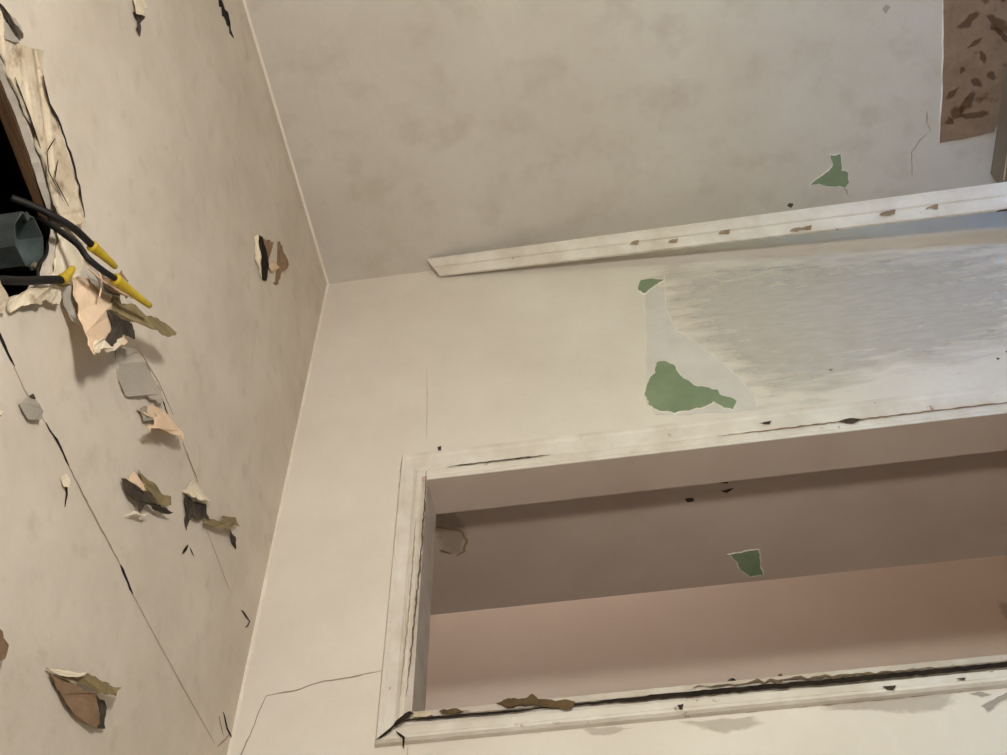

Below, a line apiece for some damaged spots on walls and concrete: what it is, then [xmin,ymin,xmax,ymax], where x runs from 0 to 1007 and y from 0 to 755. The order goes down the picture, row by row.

peeling [809,153,850,197]
peeling [254,234,289,285]
crack [0,333,29,396]
peeling [62,266,185,441]
crack [139,350,173,414]
peeling [636,270,757,415]
peeling [121,470,173,516]
peeling [183,479,239,549]
crack [42,417,427,755]
peeling [726,549,764,577]
peeling [0,629,9,661]
peeling [46,668,121,729]